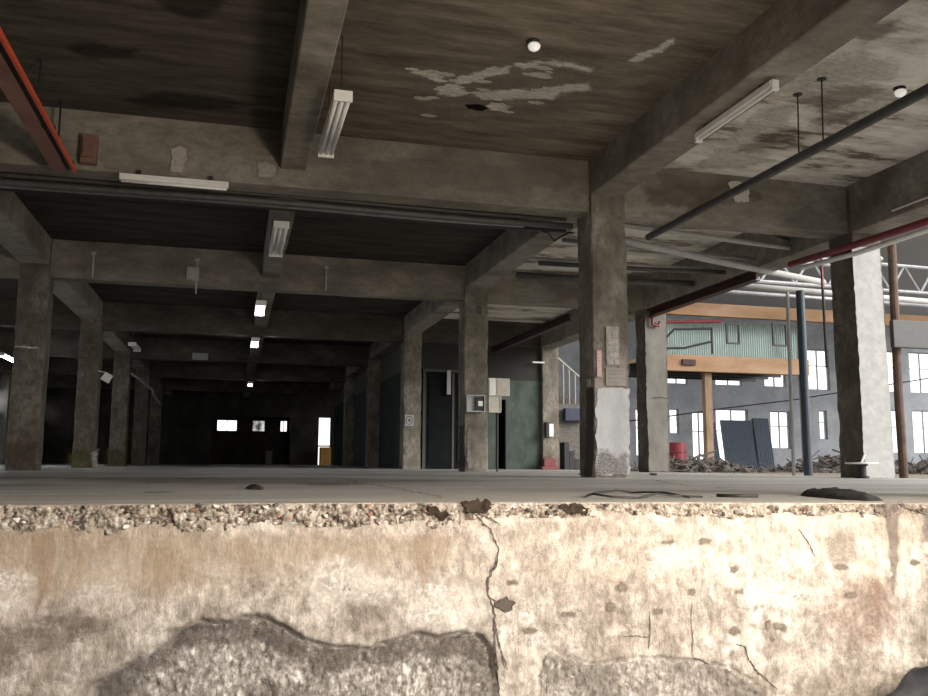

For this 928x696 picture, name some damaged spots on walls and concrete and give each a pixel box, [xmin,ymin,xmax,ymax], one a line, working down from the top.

peeling [405,54,604,123]
spalling [0,503,928,535]
spalling [96,614,495,696]
crack [472,512,516,696]
spalling [766,620,787,641]